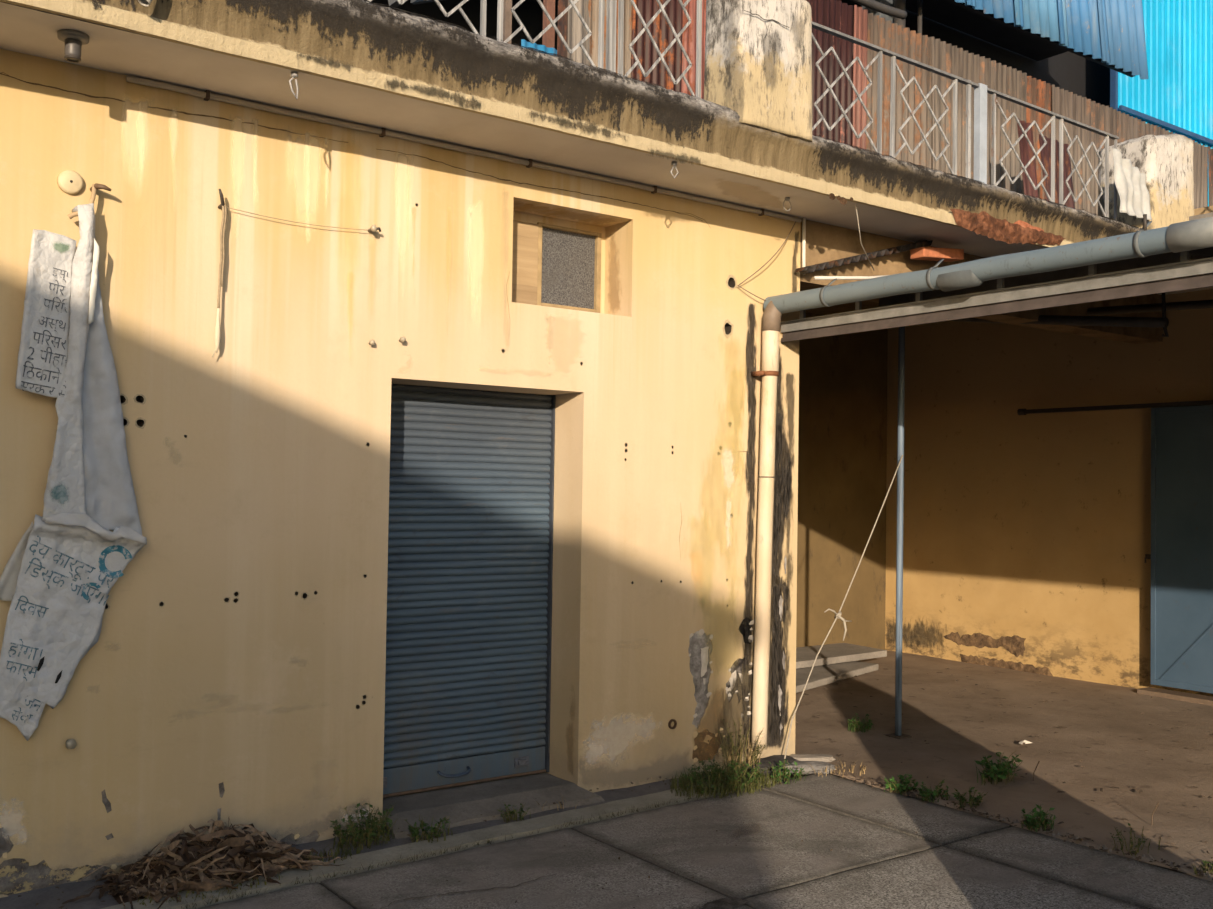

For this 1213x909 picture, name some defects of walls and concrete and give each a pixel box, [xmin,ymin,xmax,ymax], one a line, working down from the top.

water stain [297,54,351,71]
crack [0,72,348,143]
mould [387,80,481,109]
mould [531,111,625,137]
water stain [651,150,700,164]
water stain [718,304,756,756]
water stain [767,349,794,747]
spalling [738,619,755,643]
water stain [887,621,943,648]
peeling [688,629,752,763]
spalling [0,827,122,896]